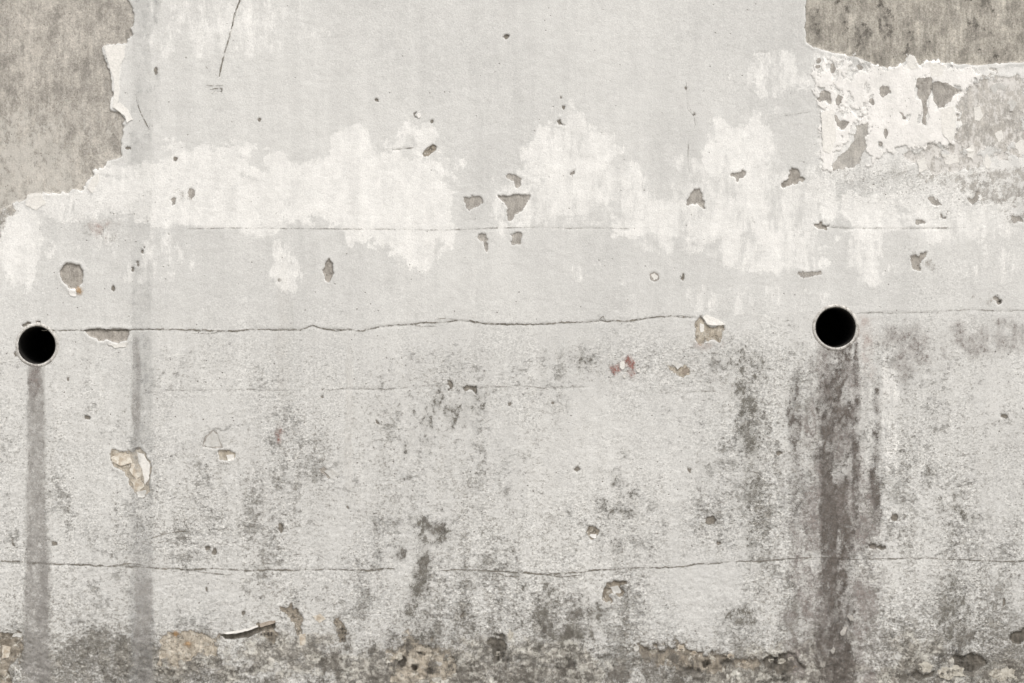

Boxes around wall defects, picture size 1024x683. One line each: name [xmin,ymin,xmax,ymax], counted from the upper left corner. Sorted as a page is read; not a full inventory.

crack [206,0,240,92]
peeling [0,0,134,237]
peeling [804,0,1024,223]
peeling [498,174,530,245]
crack [42,315,691,334]
leakage [23,364,51,683]
crack [1,527,394,575]
peeling [157,603,347,670]
leakage [390,515,625,674]
crack [440,557,1024,577]
leakage [784,342,883,683]
leakage [928,575,977,666]